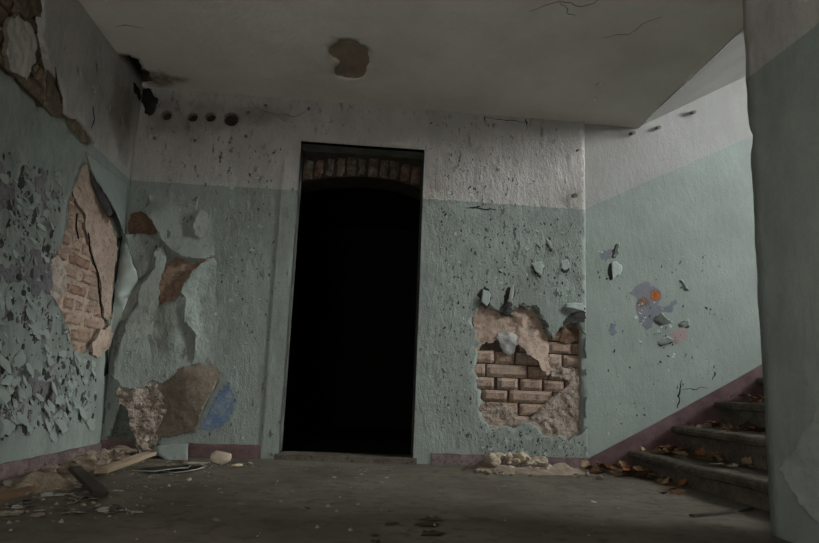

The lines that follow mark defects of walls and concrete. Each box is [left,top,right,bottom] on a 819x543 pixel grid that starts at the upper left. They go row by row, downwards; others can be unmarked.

spalling [329,39,369,78]
peeling [0,0,276,443]
flaking render [432,207,588,458]
peeling [598,243,698,371]
peeling [153,443,188,460]